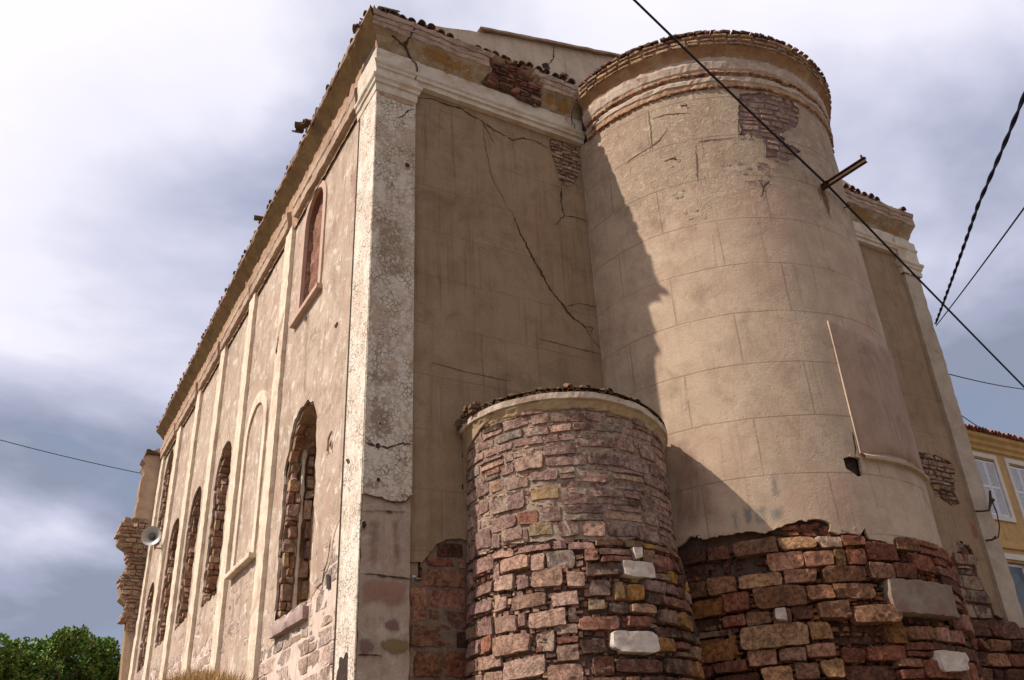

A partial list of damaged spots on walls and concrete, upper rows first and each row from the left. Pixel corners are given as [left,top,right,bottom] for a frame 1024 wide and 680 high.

flaking render [486,63,542,107]
crack [392,28,601,354]
spalling [547,138,581,189]
crack [628,112,685,162]
crack [695,119,740,181]
spalling [721,91,800,190]
crack [365,438,412,449]
spalling [919,452,958,507]